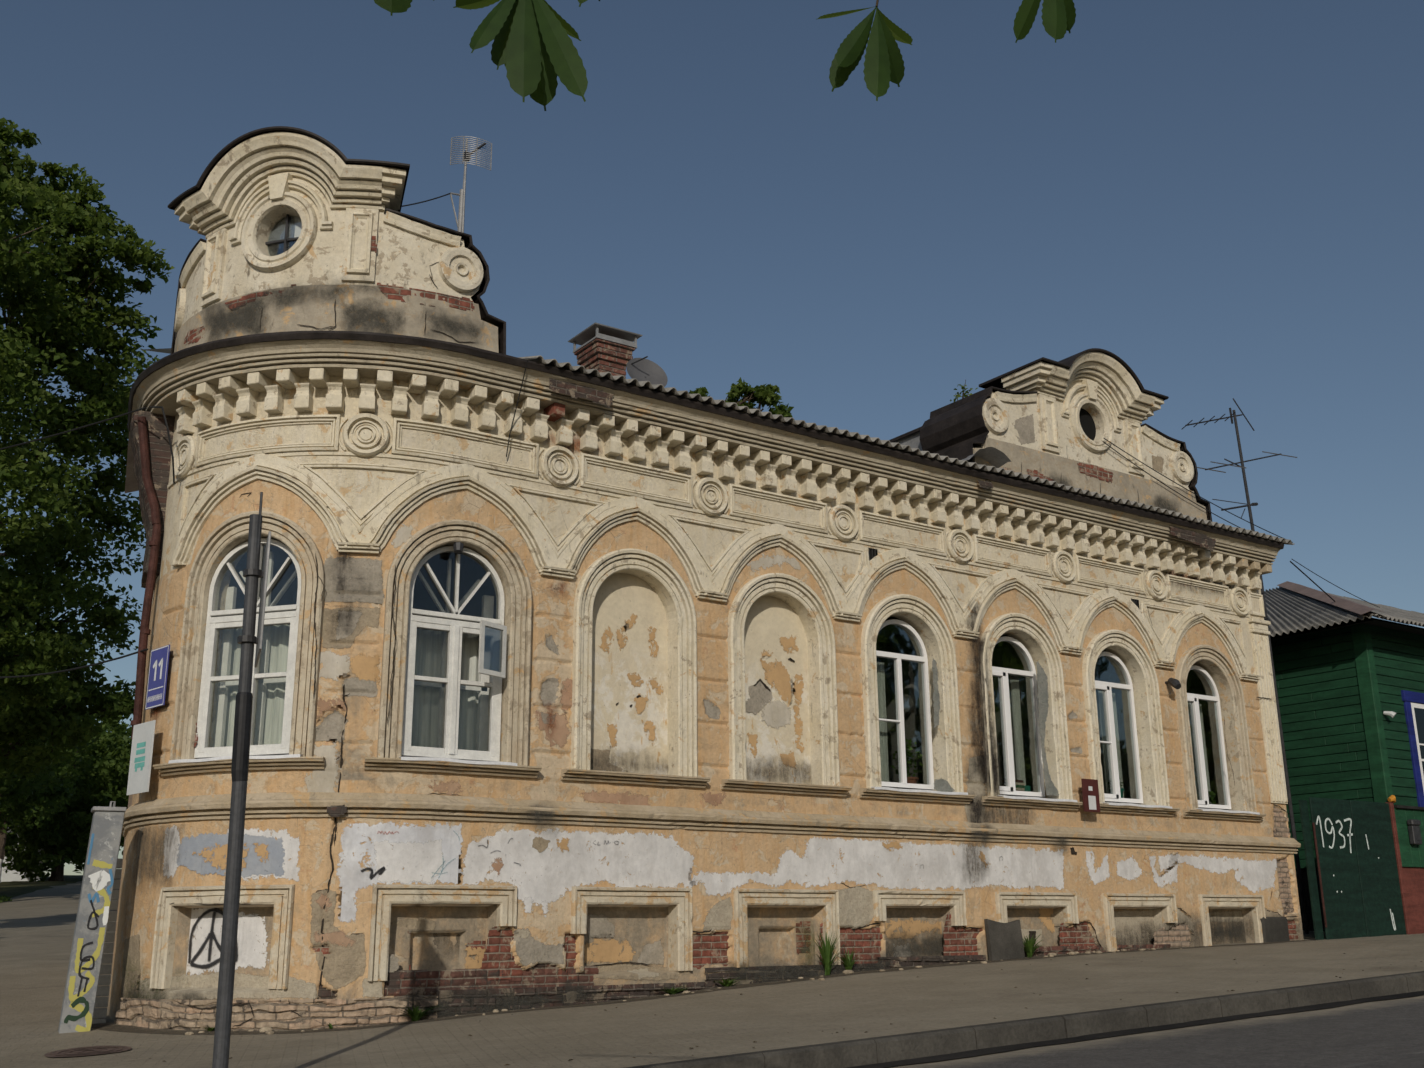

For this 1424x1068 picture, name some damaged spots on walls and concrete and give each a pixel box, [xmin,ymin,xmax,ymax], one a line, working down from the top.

flaking render [225,284,296,310]
flaking render [377,283,475,311]
crack [387,566,396,725]
peeling [599,613,659,658]
peeling [616,672,663,746]
peeling [746,636,804,769]
peeling [590,723,628,772]
crack [288,553,362,1016]
flaking render [120,889,733,1001]
flaking render [943,913,983,956]
flaking render [1021,906,1097,946]
crack [176,1001,254,1027]